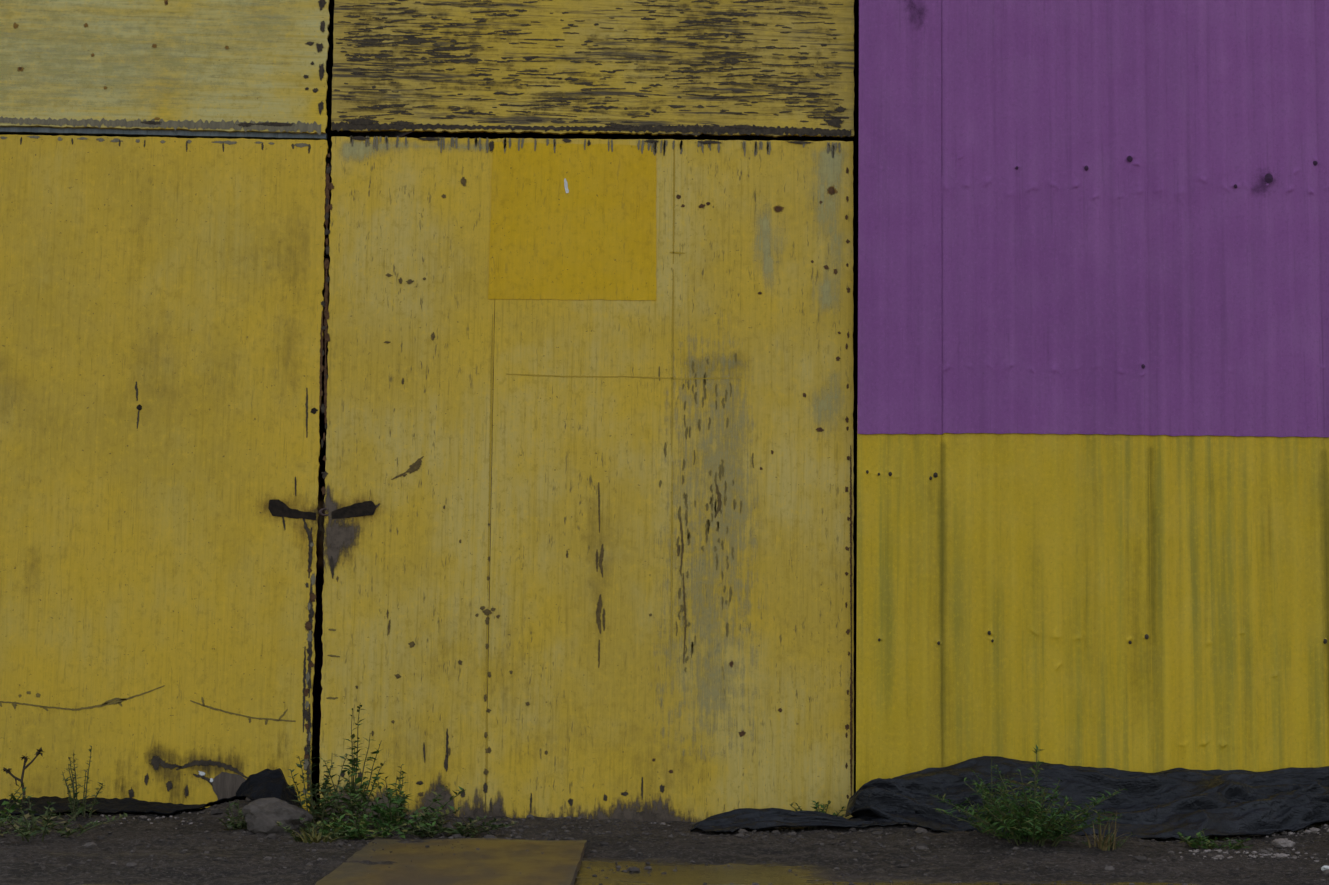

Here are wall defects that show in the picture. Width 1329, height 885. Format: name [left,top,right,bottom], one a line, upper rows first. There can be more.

peeling [0,0,851,494]
peeling [676,359,742,672]